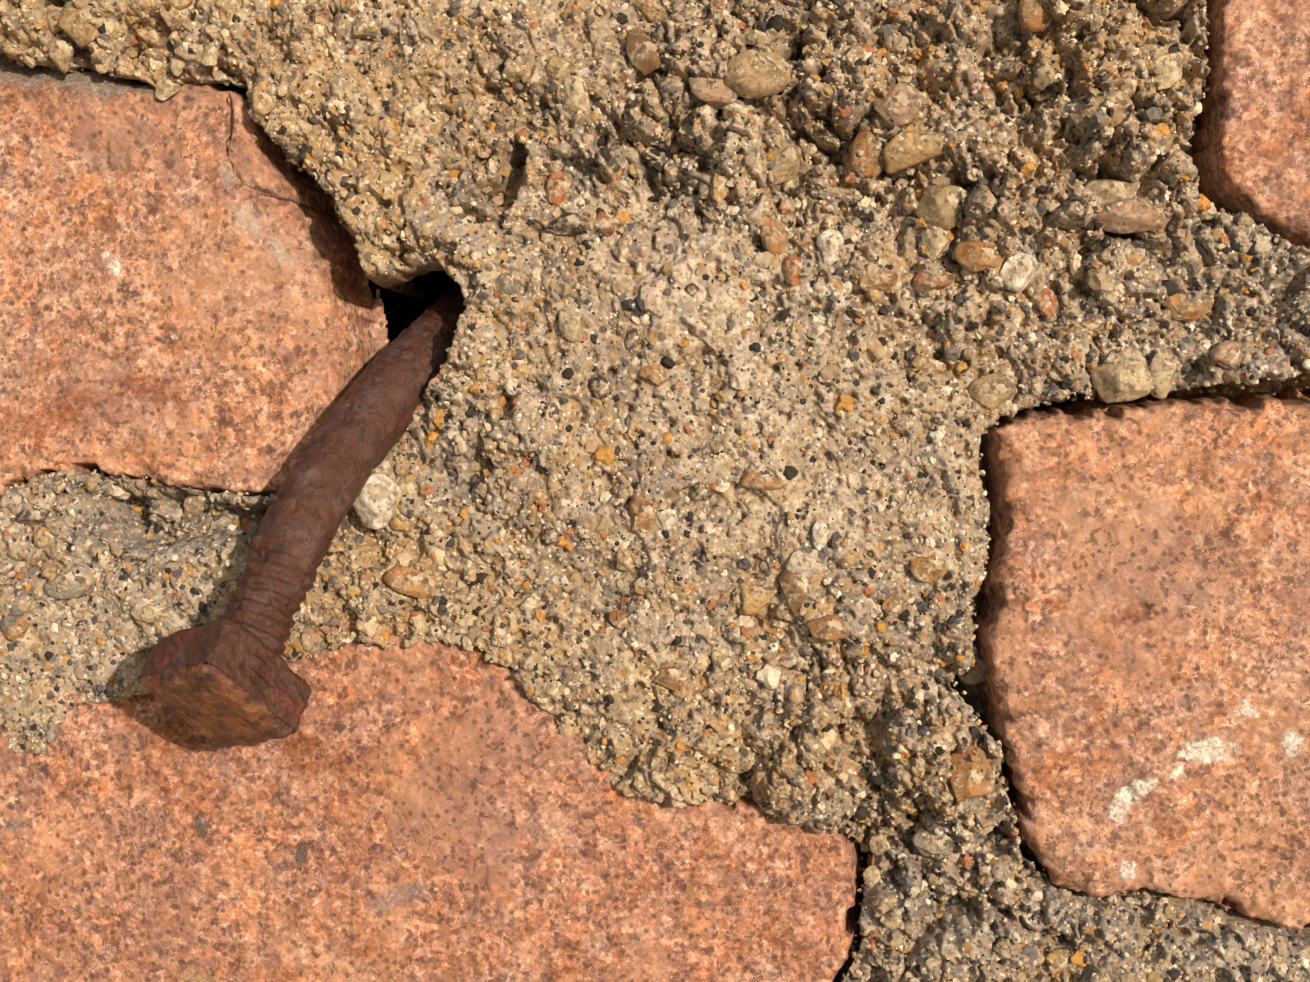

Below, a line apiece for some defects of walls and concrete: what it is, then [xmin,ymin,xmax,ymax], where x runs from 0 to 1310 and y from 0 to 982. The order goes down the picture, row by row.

water stain [1233,700,1259,718]
water stain [1280,731,1303,758]
water stain [1109,736,1240,824]
water stain [1119,861,1136,880]